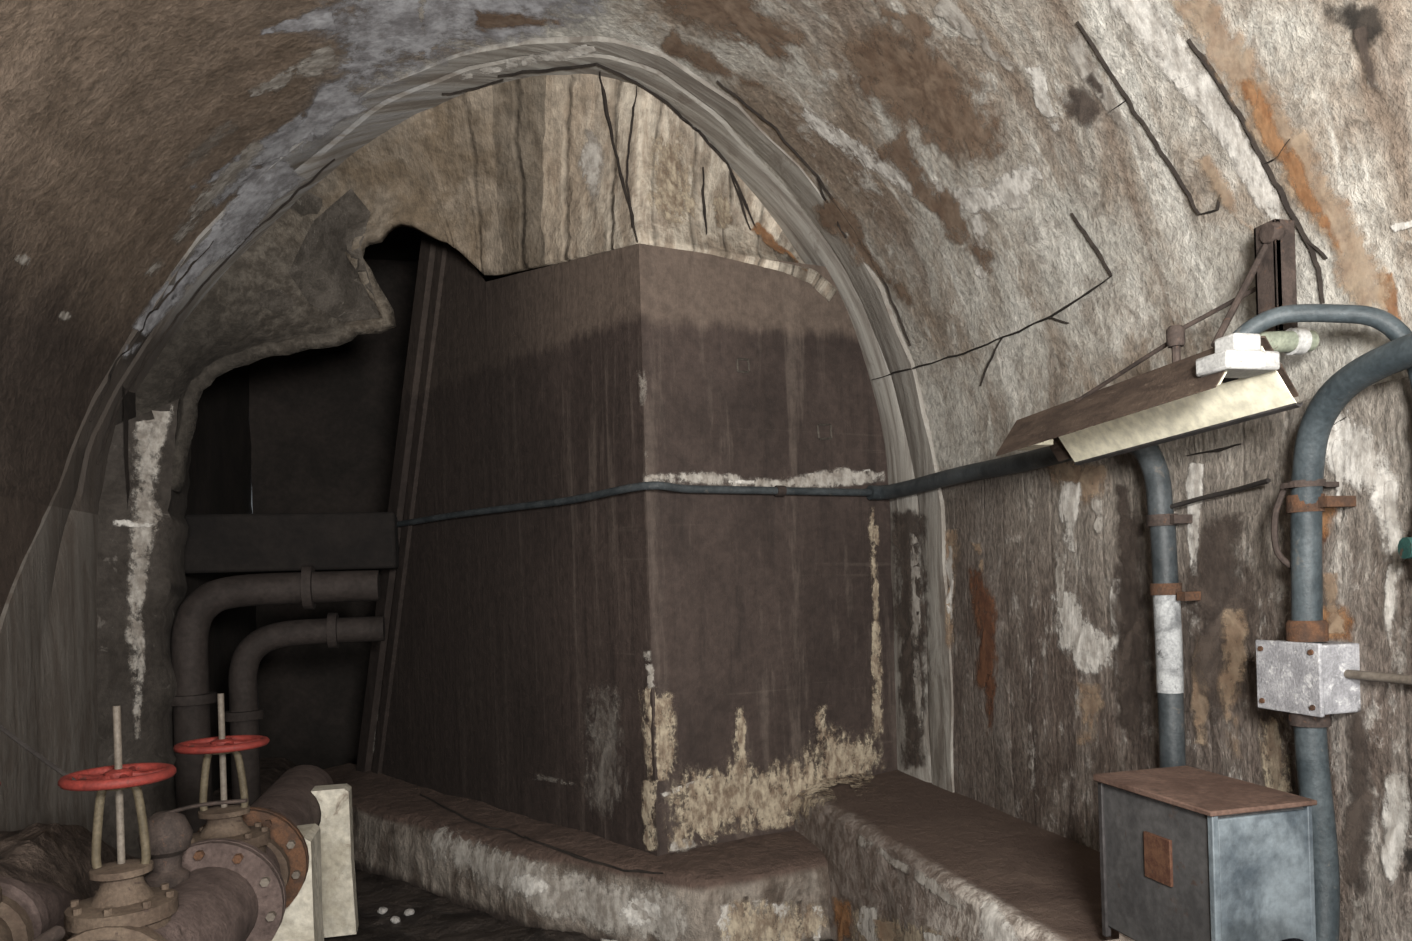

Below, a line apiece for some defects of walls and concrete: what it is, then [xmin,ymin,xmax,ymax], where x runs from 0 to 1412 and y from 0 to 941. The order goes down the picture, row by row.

crack [442,63,757,243]
crack [717,80,1112,386]
crack [1076,21,1221,215]
rust [1173,0,1401,320]
spalling [113,407,173,738]
rust [969,543,998,727]